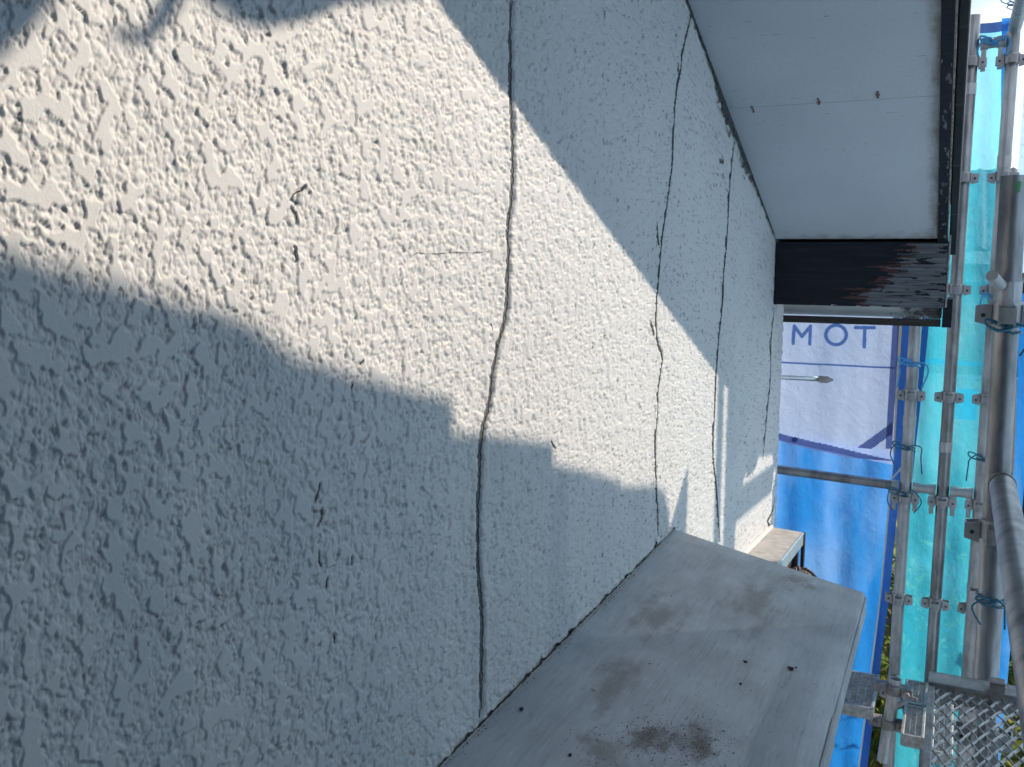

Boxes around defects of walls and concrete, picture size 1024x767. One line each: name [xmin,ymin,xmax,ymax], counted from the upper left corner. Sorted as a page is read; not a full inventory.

crack [414,0,716,767]
crack [712,142,776,542]
peeling [831,147,949,308]